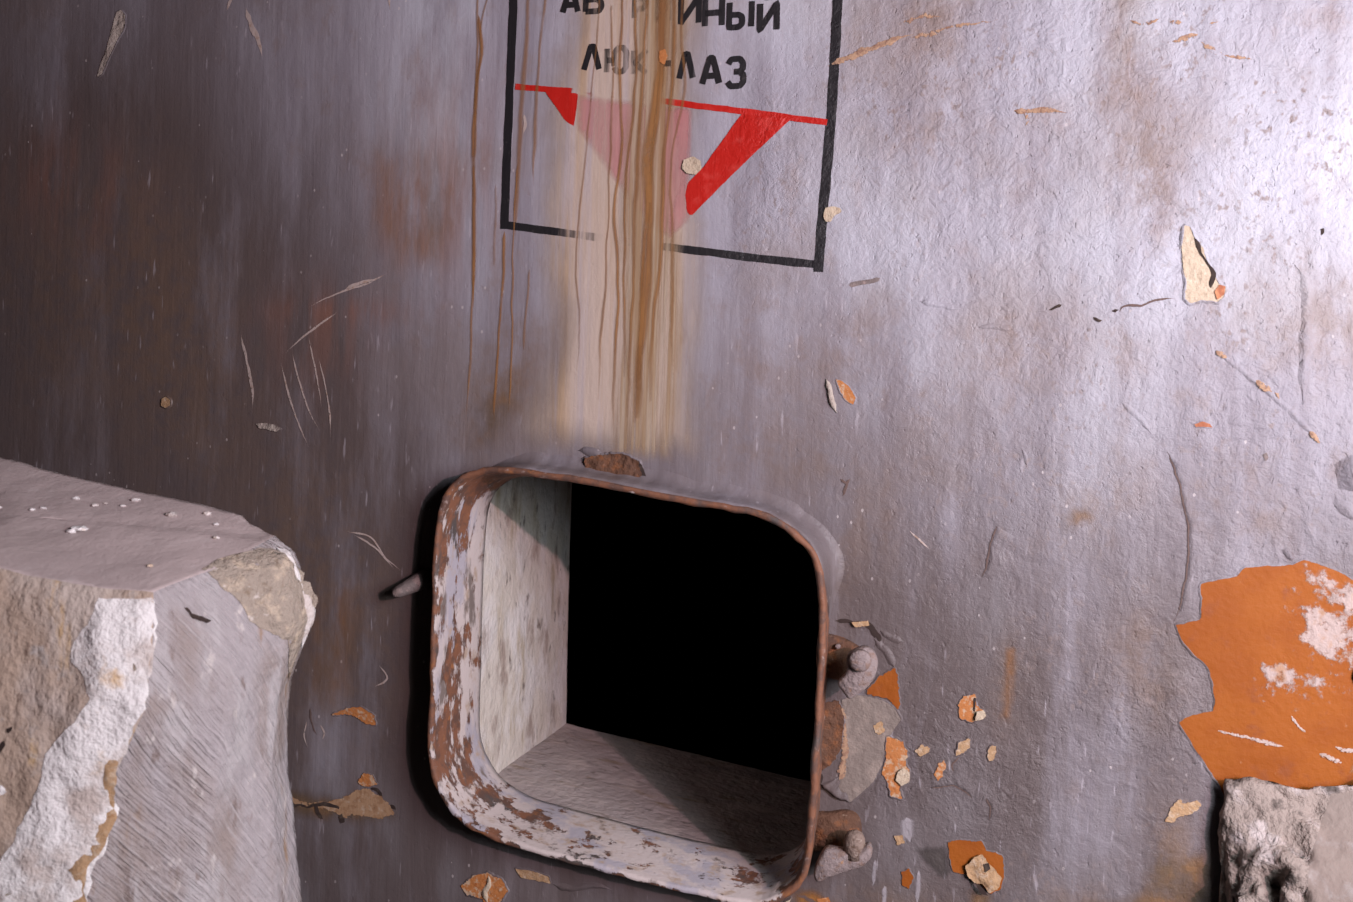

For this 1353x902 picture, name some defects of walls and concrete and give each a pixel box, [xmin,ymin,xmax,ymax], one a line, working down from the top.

corrosion [468,0,487,388]
corrosion [493,0,542,411]
corrosion [578,0,677,477]
spalling [1179,224,1229,307]
spalling [202,548,318,678]
peeling [358,772,378,787]
corrosion [821,699,845,770]
flaking render [837,667,998,803]
peeling [1174,558,1353,799]
peeling [900,867,915,889]
peeling [947,838,1005,896]